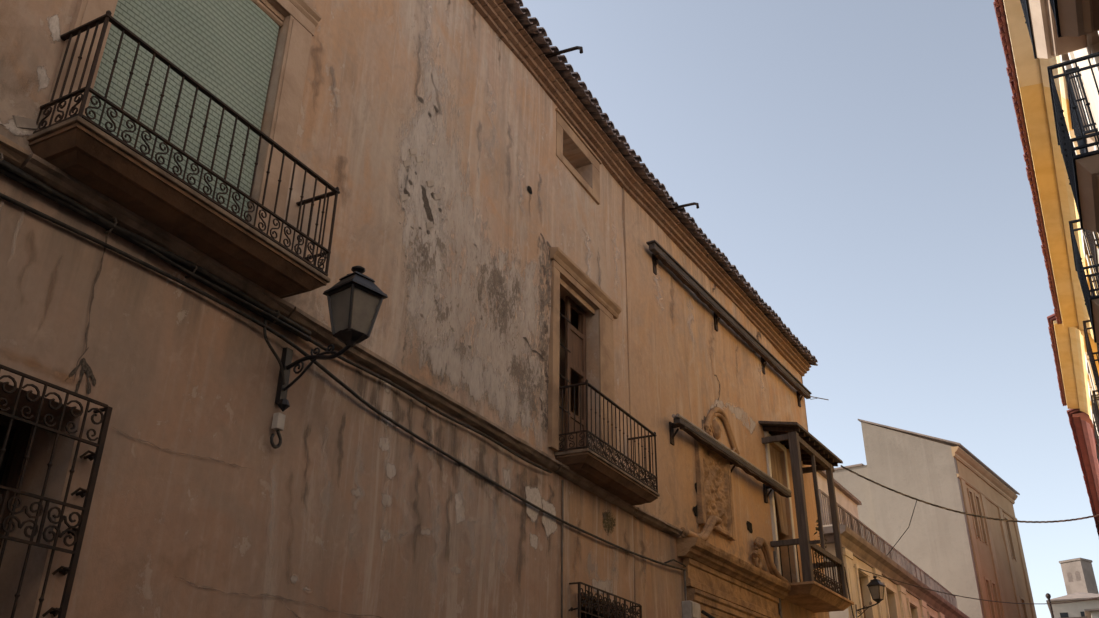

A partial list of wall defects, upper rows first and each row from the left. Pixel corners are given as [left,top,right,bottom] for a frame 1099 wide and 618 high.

flaking render [0,115,37,136]
crack [65,230,108,394]
flaking render [398,34,552,445]
flaking render [525,486,557,549]